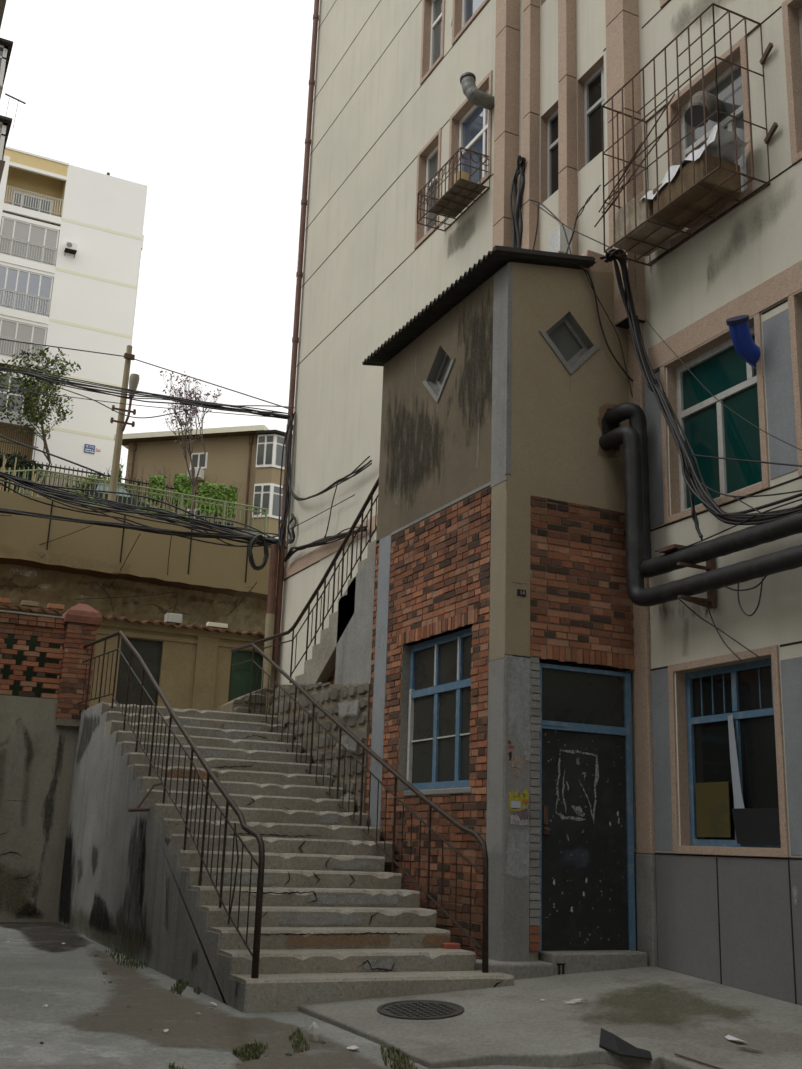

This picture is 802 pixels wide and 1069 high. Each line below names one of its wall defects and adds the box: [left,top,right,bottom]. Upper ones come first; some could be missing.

leakage [386,405,441,495]
leakage [43,738,64,832]
leakage [58,818,149,956]